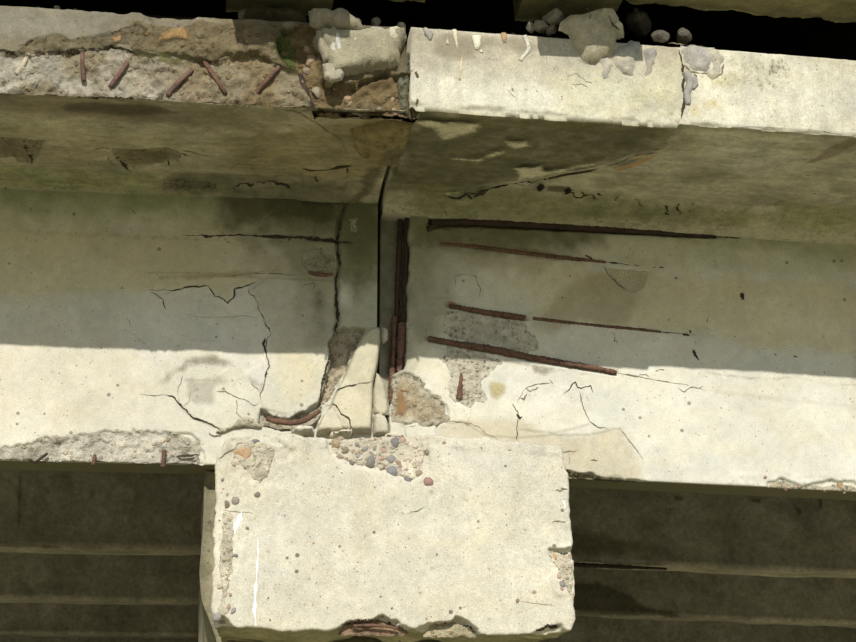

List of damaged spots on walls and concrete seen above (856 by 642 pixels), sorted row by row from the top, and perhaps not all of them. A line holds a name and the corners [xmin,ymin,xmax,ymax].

water stain [69,104,166,116]
spalling [0,20,419,123]
crack [150,109,372,430]
spalling [387,218,661,427]
spalling [0,429,202,468]
crack [142,375,239,459]
spalling [216,330,364,481]
spalling [329,436,434,486]
crack [401,380,605,439]
spalling [763,475,856,494]
spalling [212,478,240,624]